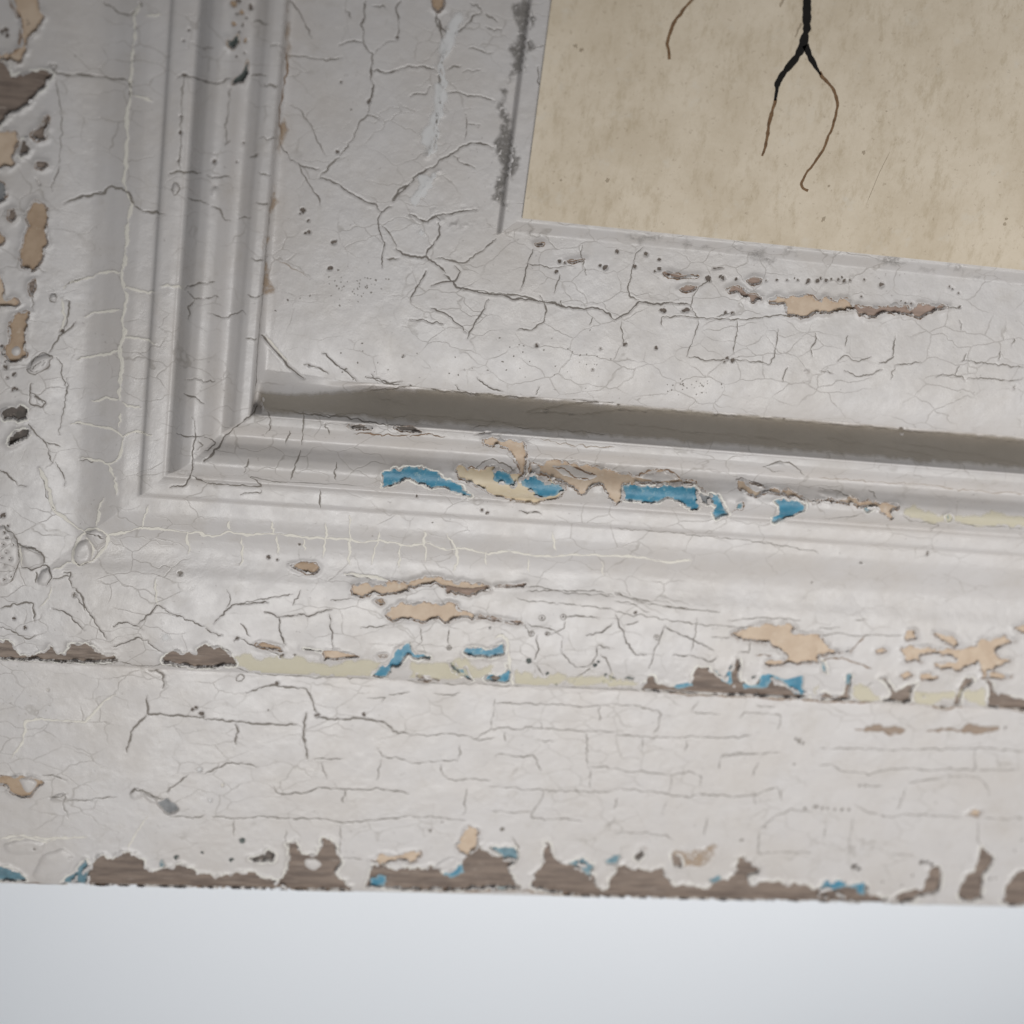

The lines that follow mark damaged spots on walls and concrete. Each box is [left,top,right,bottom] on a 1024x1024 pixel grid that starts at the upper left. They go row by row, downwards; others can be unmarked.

peeling [0,0,55,391]
crack [170,0,1021,390]
peeling [644,252,961,320]
crack [28,2,818,686]
peeling [0,404,32,448]
crack [760,418,946,434]
peeling [379,432,900,526]
peeling [159,637,359,670]
peeling [350,576,527,685]
peeling [609,623,1024,712]
peeling [59,825,945,905]
peeling [956,845,1024,907]